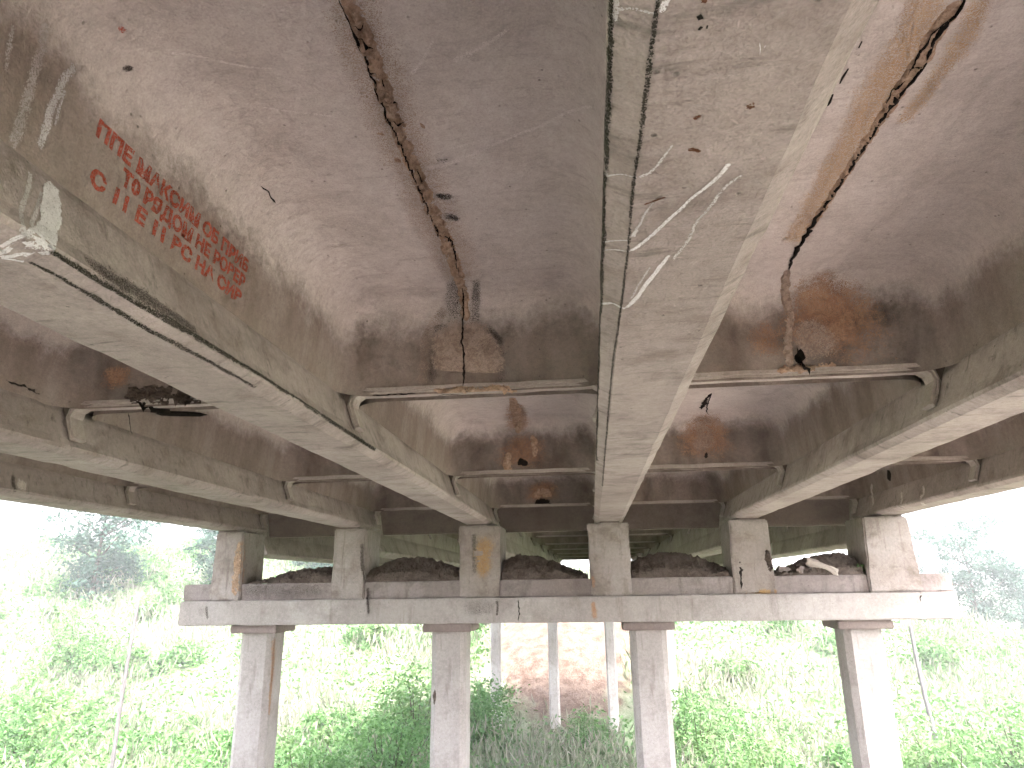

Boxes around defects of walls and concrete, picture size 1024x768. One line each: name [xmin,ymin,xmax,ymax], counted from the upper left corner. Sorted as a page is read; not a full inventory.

leakage [8,21,49,149]
leakage [36,64,76,150]
crack [323,0,481,286]
crack [779,0,992,270]
leakage [417,279,508,394]
spalling [124,384,207,433]
corrosion [494,398,551,473]